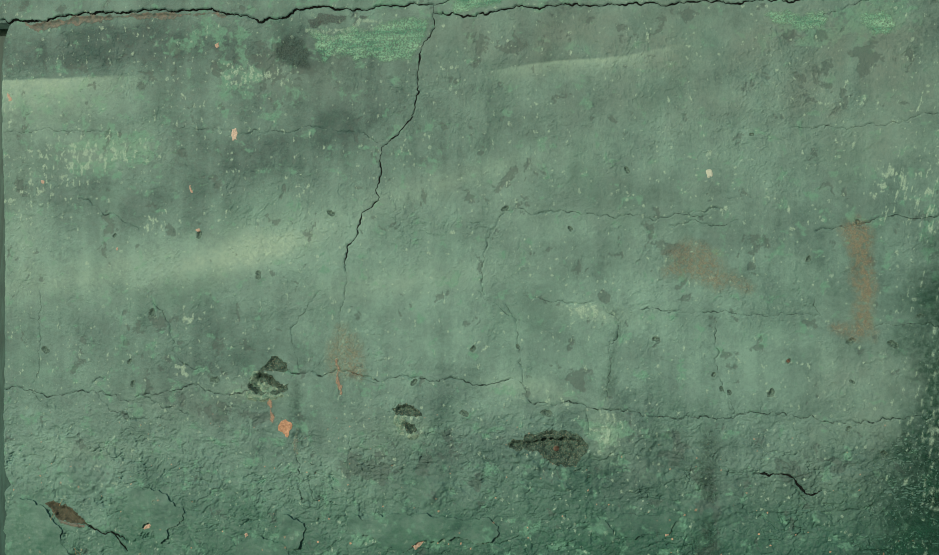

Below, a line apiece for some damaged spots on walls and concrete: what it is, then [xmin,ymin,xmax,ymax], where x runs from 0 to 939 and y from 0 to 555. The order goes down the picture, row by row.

crack [3,0,800,264]
spalling [245,356,291,402]
spalling [278,419,292,437]
spalling [392,403,422,440]
spalling [501,429,588,492]
spalling [45,500,87,528]